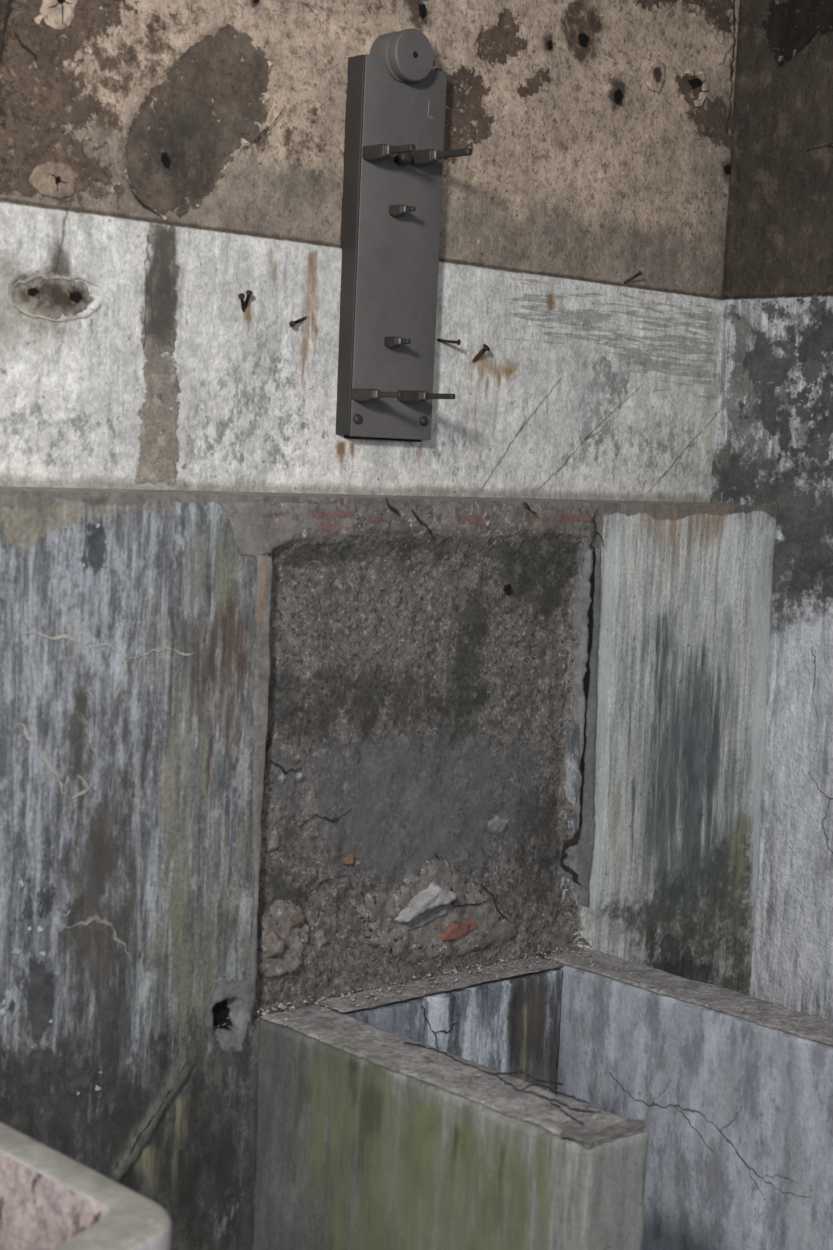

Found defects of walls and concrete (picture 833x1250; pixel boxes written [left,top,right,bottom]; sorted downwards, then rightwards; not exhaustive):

spalling [761,0,833,67]
spalling [0,0,285,220]
spalling [12,270,100,322]
corrosion [302,254,317,367]
spalling [262,497,598,554]
damp [710,454,833,629]
crack [560,510,603,885]
damp [615,629,732,908]
damp [64,692,131,1022]
spalling [349,850,520,966]
crack [404,1005,601,1125]
crack [610,1072,814,1200]